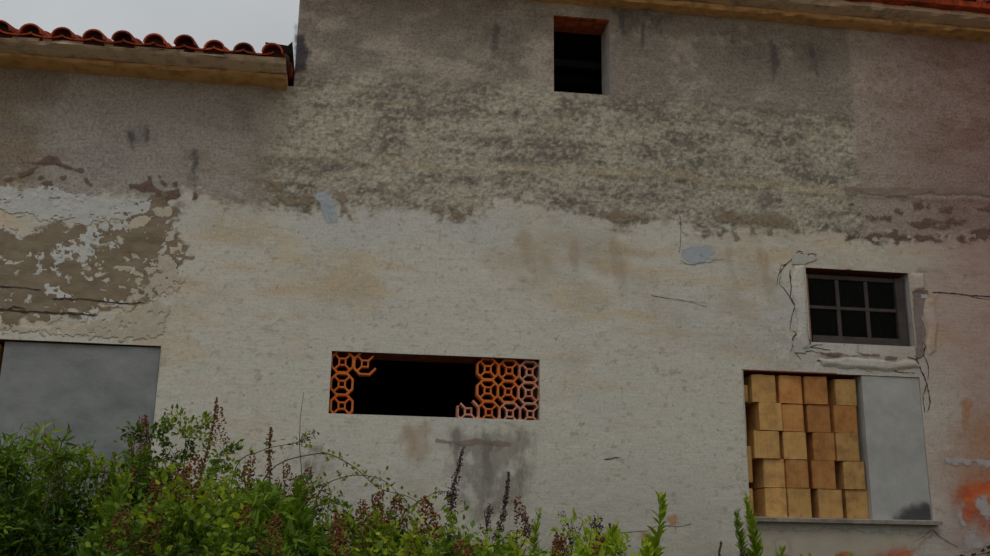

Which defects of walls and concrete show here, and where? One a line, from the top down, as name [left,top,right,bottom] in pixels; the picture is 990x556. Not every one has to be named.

peeling [0,155,194,343]
peeling [845,200,990,245]
crack [777,251,829,361]
crack [933,291,990,299]
crack [864,342,931,412]
corrosion [960,427,990,520]
peeling [956,495,990,552]